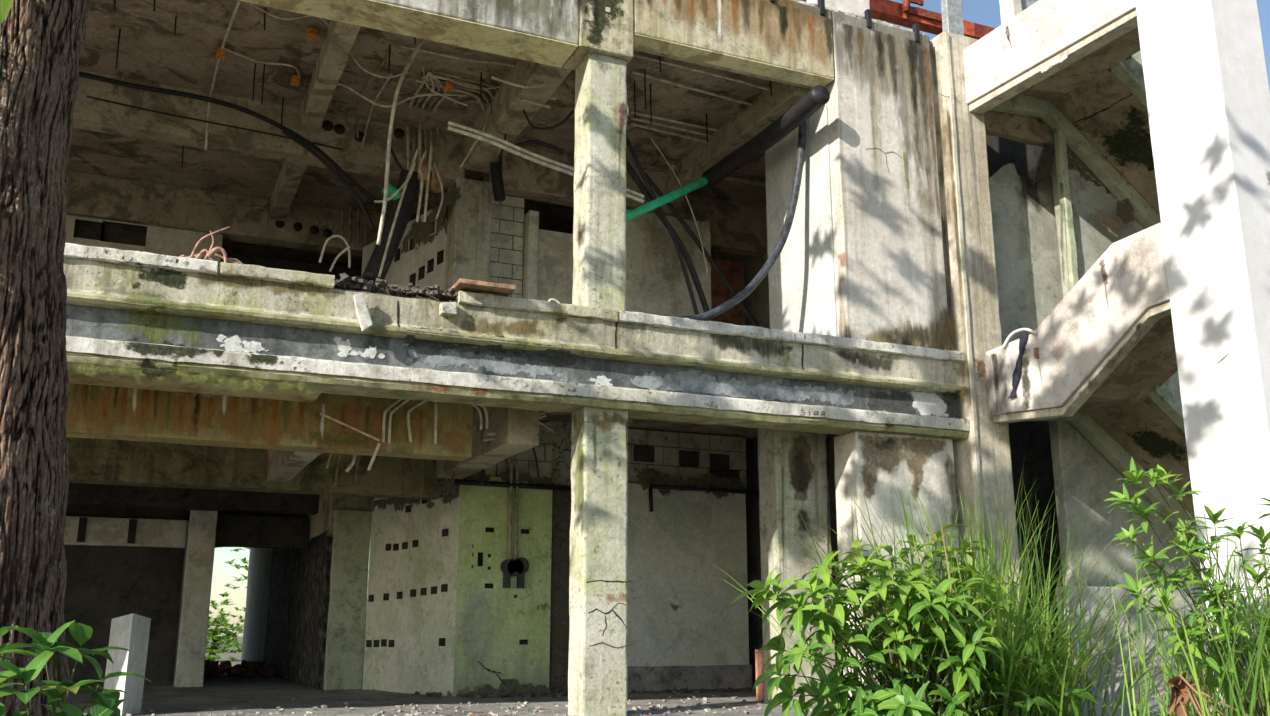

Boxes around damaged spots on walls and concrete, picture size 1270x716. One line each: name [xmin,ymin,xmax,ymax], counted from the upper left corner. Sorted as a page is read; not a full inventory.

water stain [538,0,624,56]
corrosion [647,0,707,13]
corrosion [731,0,763,27]
corrosion [778,6,833,56]
water stain [843,24,961,290]
peeling [216,334,268,355]
peeling [333,337,385,359]
water stain [837,309,956,370]
corrosion [67,384,467,452]
water stain [782,436,830,560]
water stain [858,435,959,528]
crack [586,580,630,648]